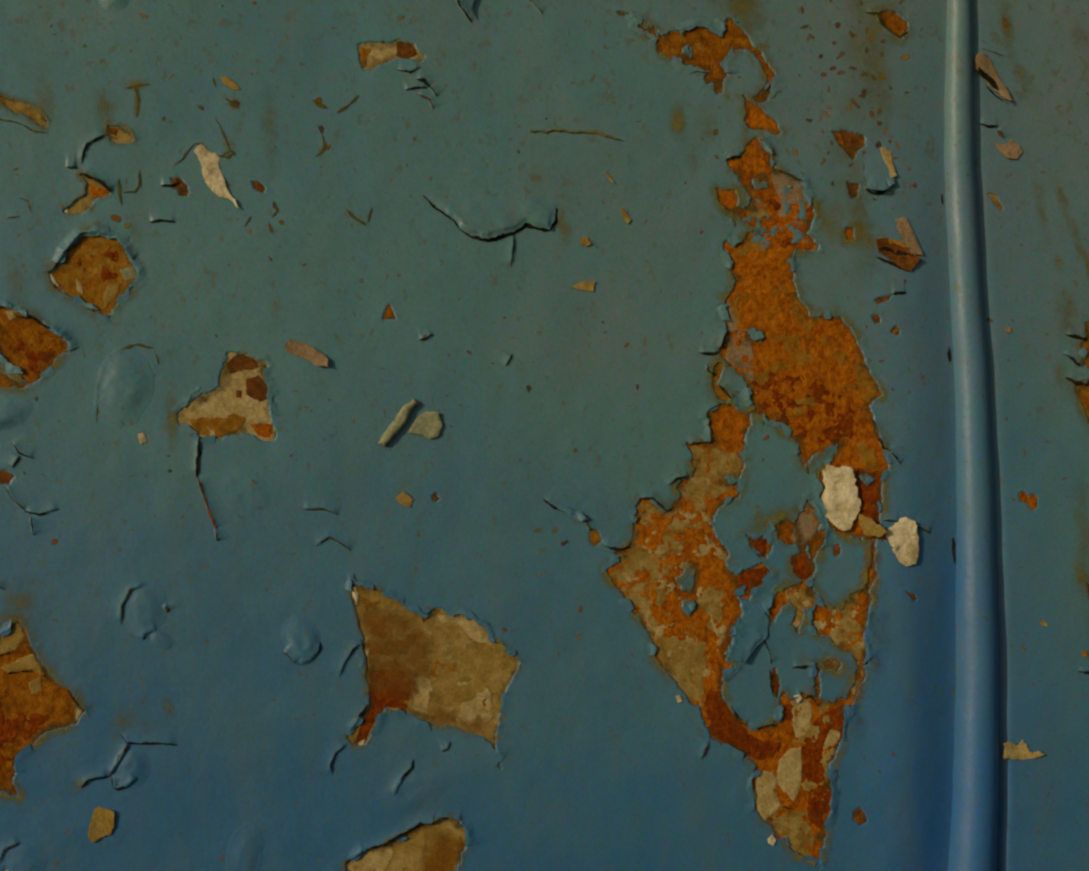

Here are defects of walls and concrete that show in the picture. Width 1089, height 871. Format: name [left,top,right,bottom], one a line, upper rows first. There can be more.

peeling [358,40,425,70]
corrosion [819,41,900,168]
peeling [974,52,1011,101]
crack [195,436,218,541]
peeling [168,343,282,444]
peeling [284,339,328,367]
peeling [590,530,602,546]
peeling [597,7,923,871]
peeling [339,572,520,771]
peeling [343,808,482,871]